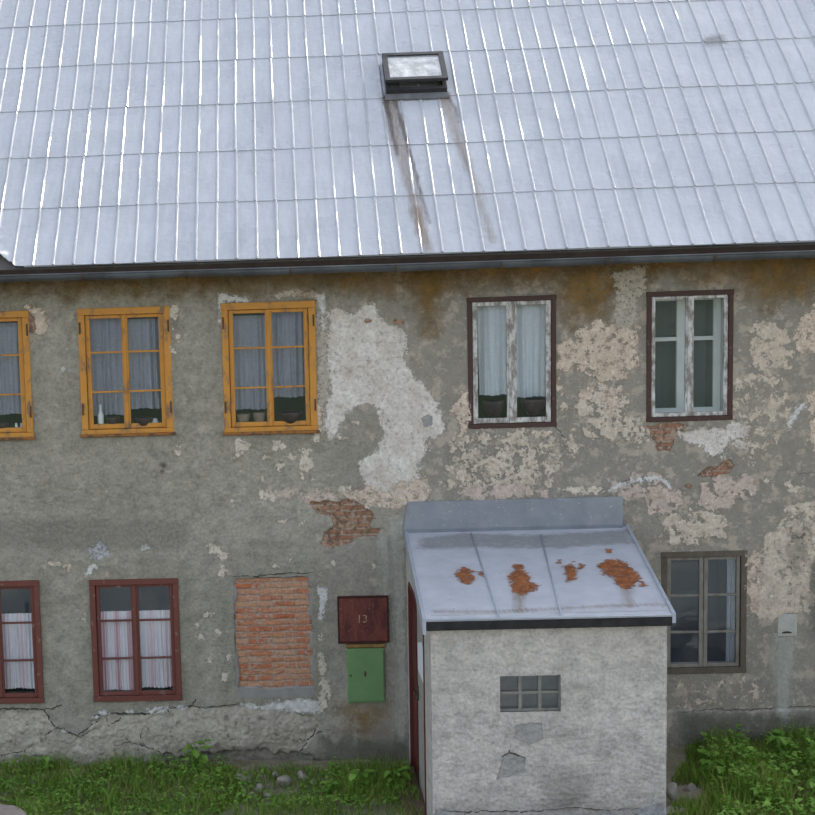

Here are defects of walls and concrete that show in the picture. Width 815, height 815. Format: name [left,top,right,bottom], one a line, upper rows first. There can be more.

corrosion [383,96,415,168]
peeling [257,265,815,627]
peeling [206,542,230,578]
corrosion [453,567,484,584]
corrosion [507,564,541,595]
corrosion [555,559,585,582]
spalling [0,651,333,766]
crack [0,698,238,756]
spalling [496,753,526,779]